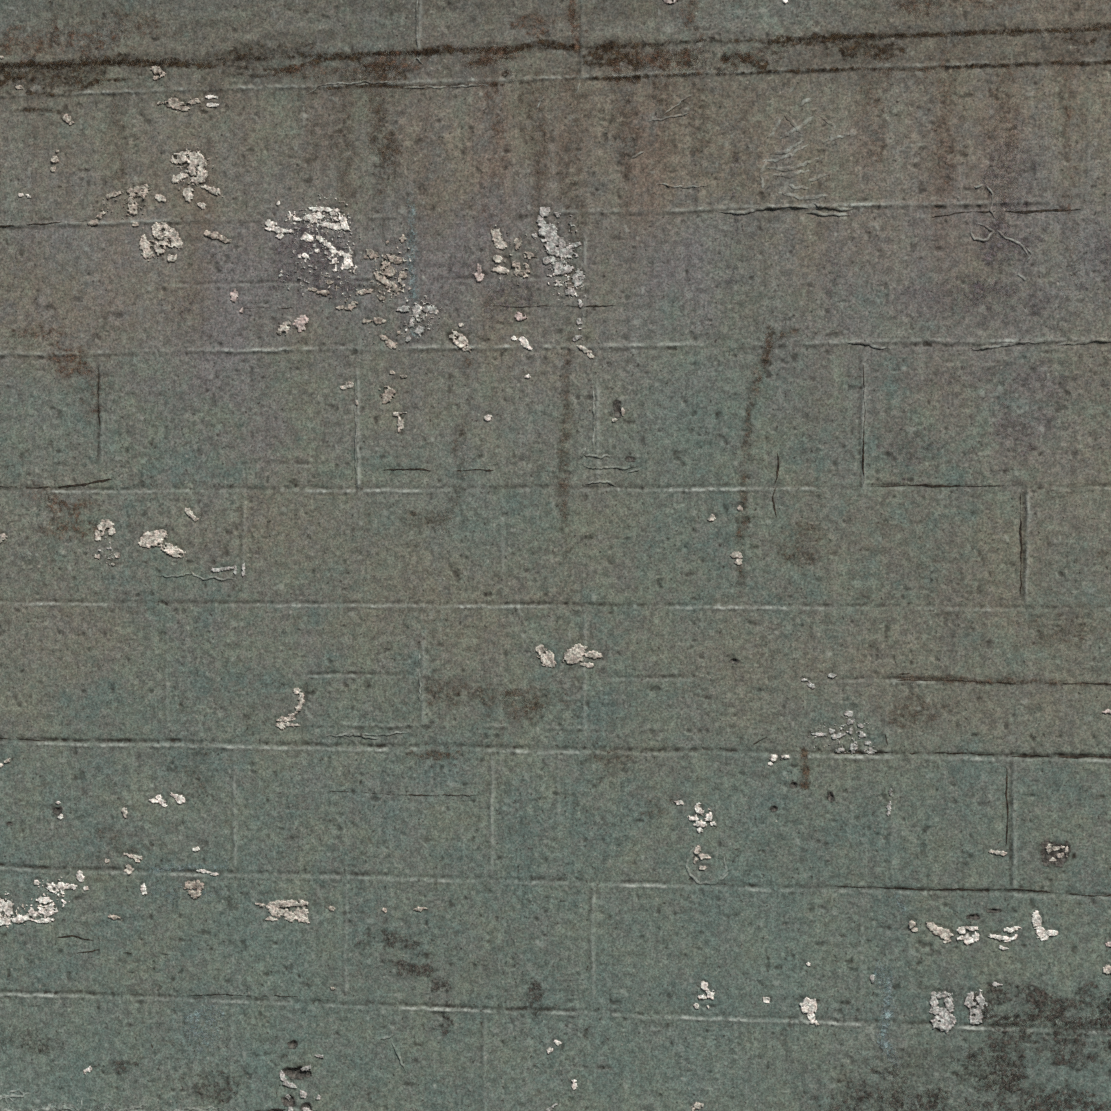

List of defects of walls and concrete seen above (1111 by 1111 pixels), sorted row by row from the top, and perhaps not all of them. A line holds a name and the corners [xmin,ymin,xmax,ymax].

peeling [170,143,223,209]
peeling [87,184,183,262]
peeling [264,194,445,350]
peeling [473,207,594,359]
peeling [94,519,120,566]
peeling [138,530,186,558]
peeling [535,644,603,668]
peeling [672,800,716,870]
peeling [0,870,89,927]
peeling [908,909,1058,951]
peeling [929,981,1003,1034]
spalling [271,1054,324,1111]